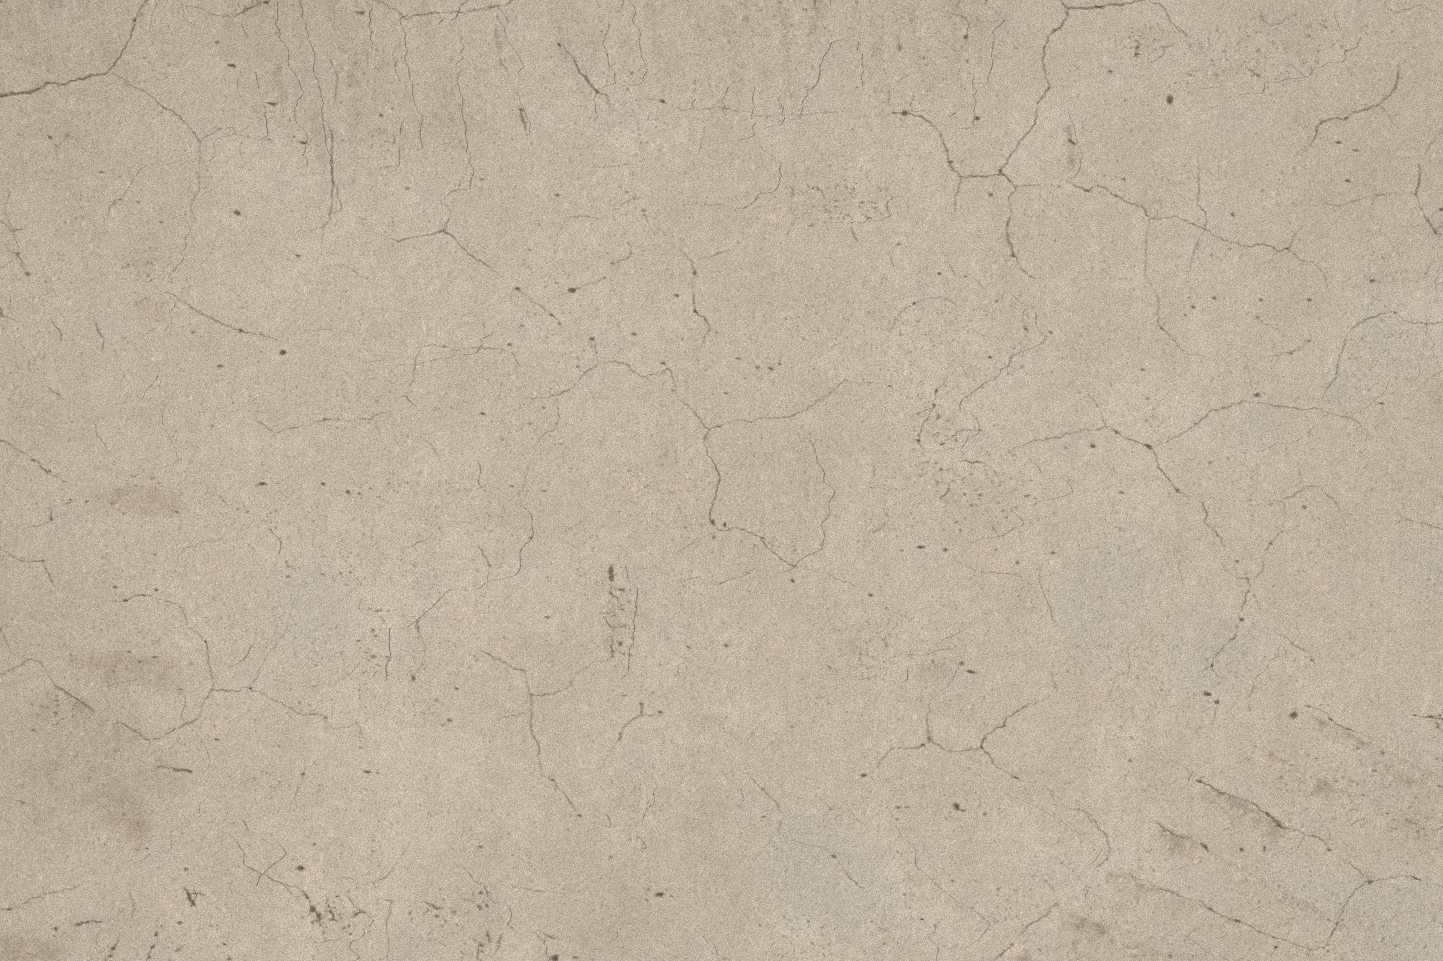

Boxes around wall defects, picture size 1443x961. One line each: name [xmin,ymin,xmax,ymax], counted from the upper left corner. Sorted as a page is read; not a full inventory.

crack [0,0,146,97]
crack [892,0,1184,272]
crack [1314,71,1398,139]
crack [694,412,793,566]
crack [1097,426,1222,539]
crack [123,589,257,772]
crack [861,705,1027,778]
crack [1196,780,1280,827]
crack [1314,836,1417,950]